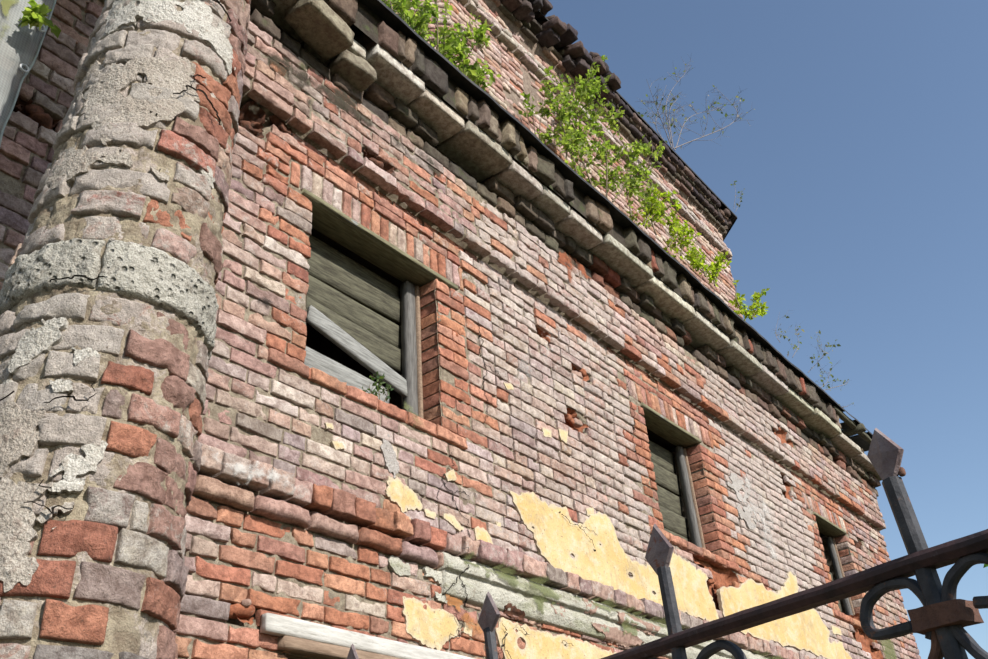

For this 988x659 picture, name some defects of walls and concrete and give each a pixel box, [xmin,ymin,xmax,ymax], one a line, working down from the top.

crack [212,0,231,23]
crack [173,74,221,125]
crack [49,274,107,282]
peeling [71,347,99,366]
peeling [49,379,74,394]
spalling [564,408,589,434]
peeling [48,478,86,516]
spalling [693,552,739,610]
peeling [434,592,448,604]
spalling [503,603,525,622]
spalling [582,596,661,648]